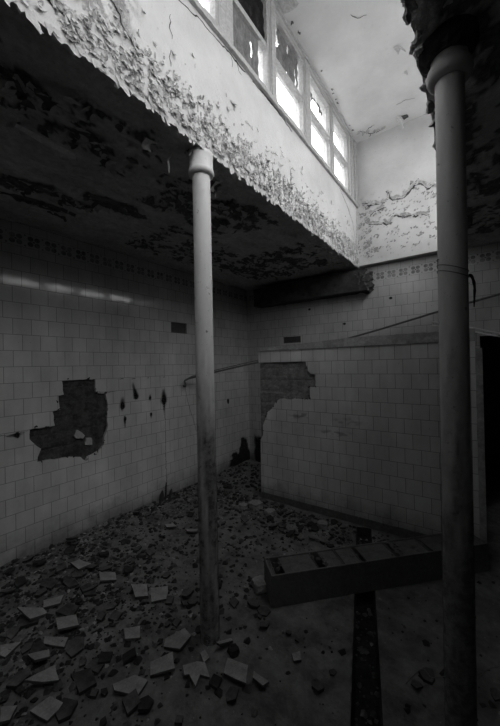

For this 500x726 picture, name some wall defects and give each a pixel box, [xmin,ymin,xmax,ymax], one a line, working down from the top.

peeling [0,0,437,282]
flaking render [434,0,500,236]
peeling [29,377,108,463]
peeling [260,361,316,435]